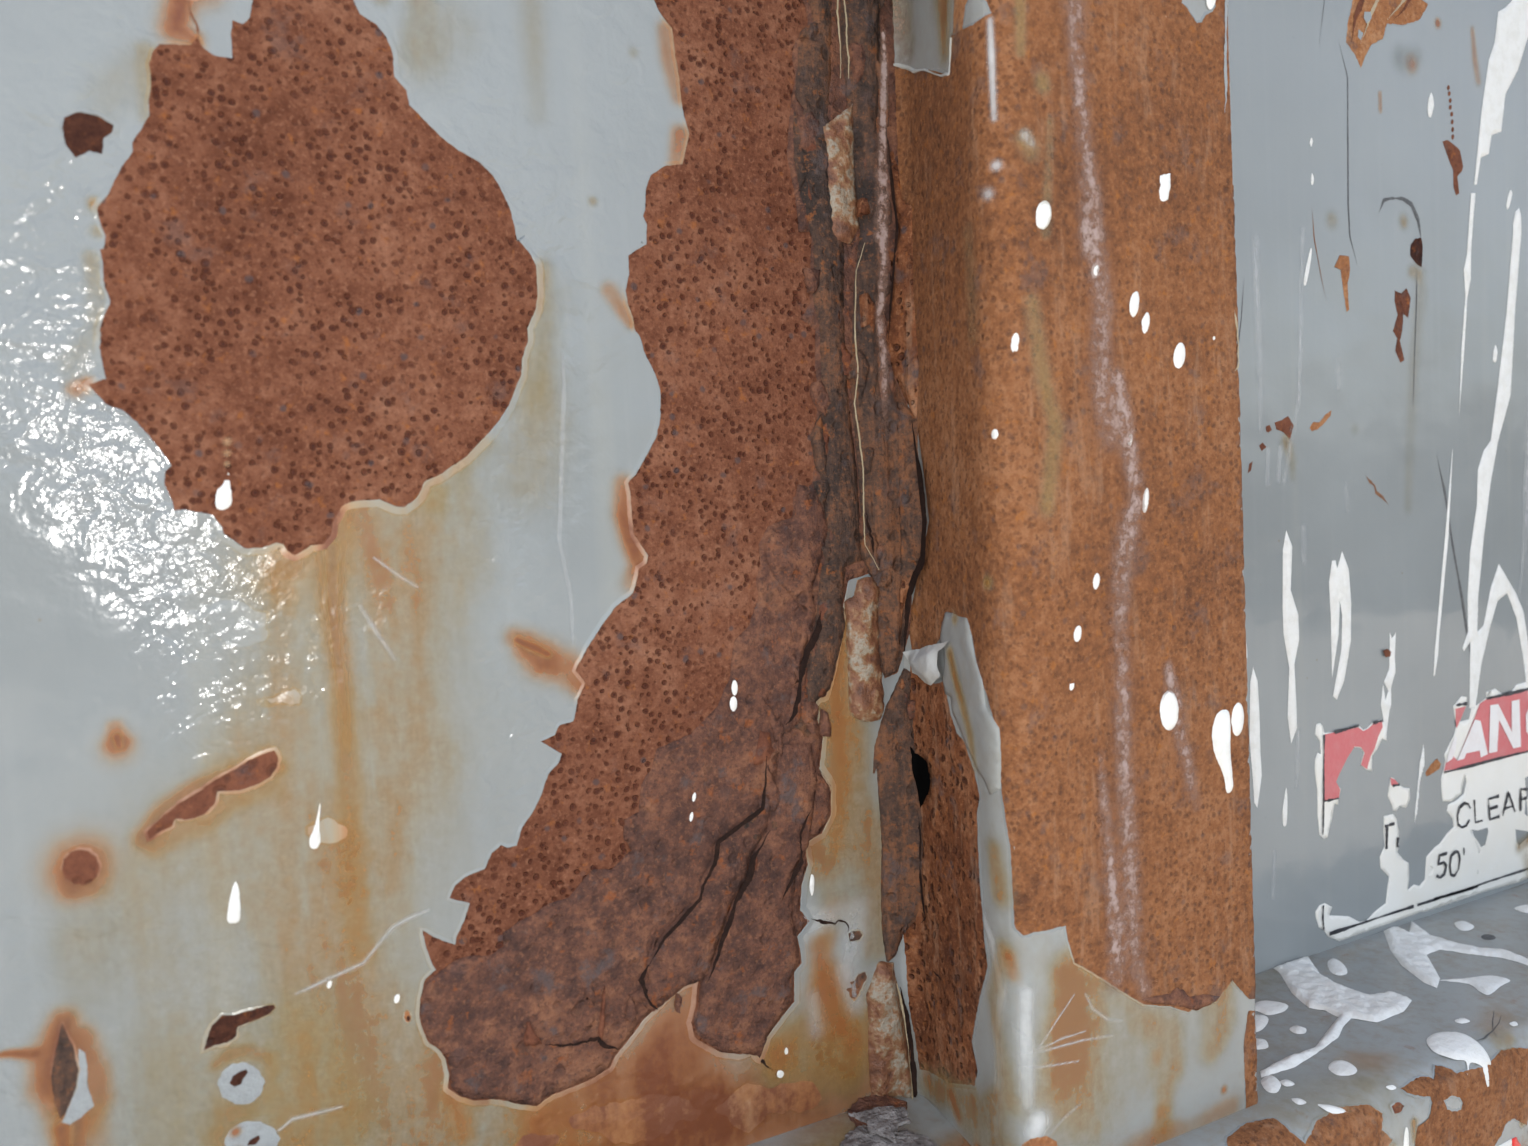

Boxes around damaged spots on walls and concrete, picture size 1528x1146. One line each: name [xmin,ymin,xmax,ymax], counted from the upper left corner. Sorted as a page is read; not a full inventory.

peeling [876,37,952,134]
rust [414,0,882,1146]
peeling [628,0,894,1056]
peeling [900,577,909,618]
rust [885,0,1528,1146]
crack [786,612,822,725]
rust [134,746,286,854]
rust [50,841,111,901]
crack [638,756,849,1010]
rust [0,1010,111,1146]
rust [200,1004,276,1077]
rust [211,1096,266,1146]